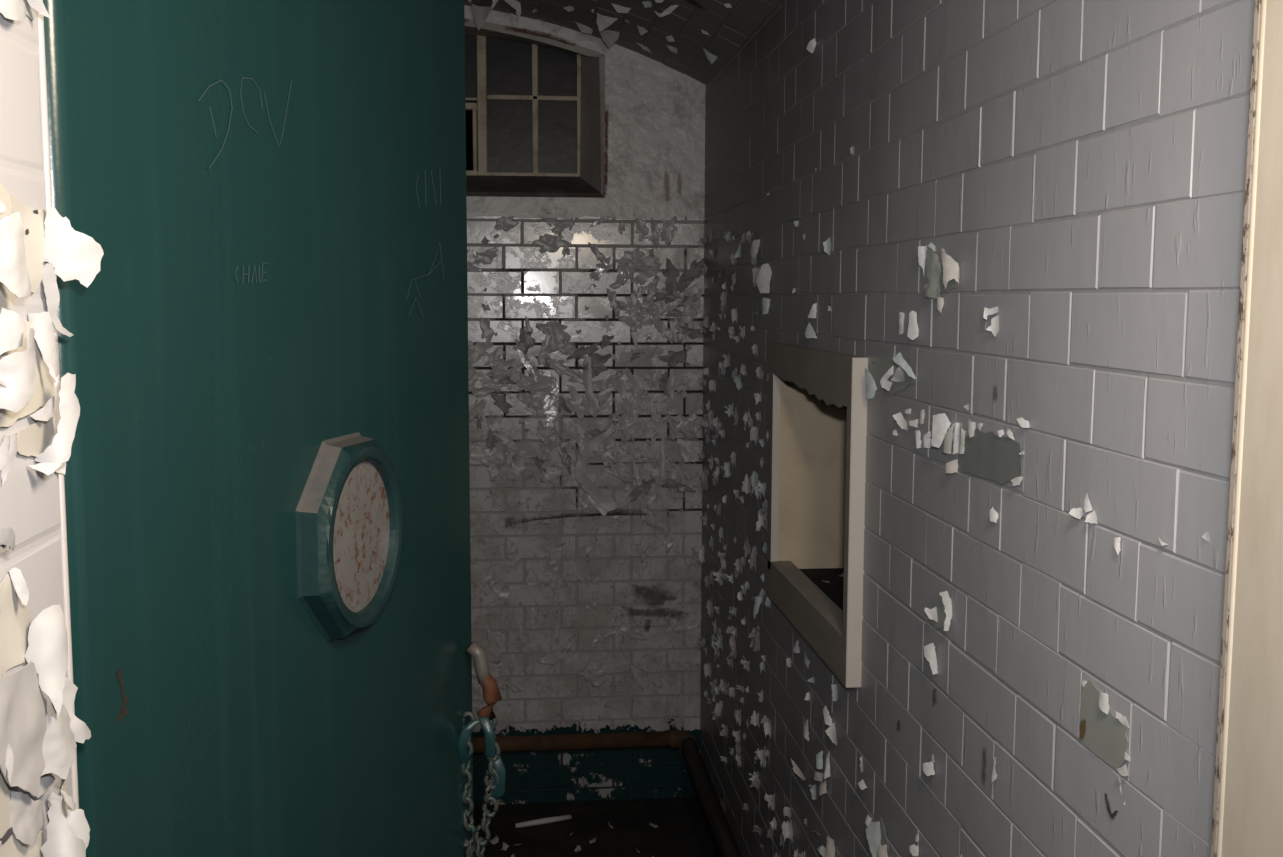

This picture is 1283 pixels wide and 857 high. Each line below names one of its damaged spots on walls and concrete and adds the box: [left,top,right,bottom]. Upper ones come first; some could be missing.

peeling [0,0,50,22]
peeling [564,0,678,54]
peeling [918,242,960,313]
peeling [898,310,919,340]
peeling [865,352,916,399]
peeling [893,404,1030,486]
peeling [467,207,847,857]
peeling [1069,494,1098,524]
peeling [923,591,952,675]
peeling [0,567,91,857]
peeling [1079,680,1130,805]
peeling [865,815,889,857]